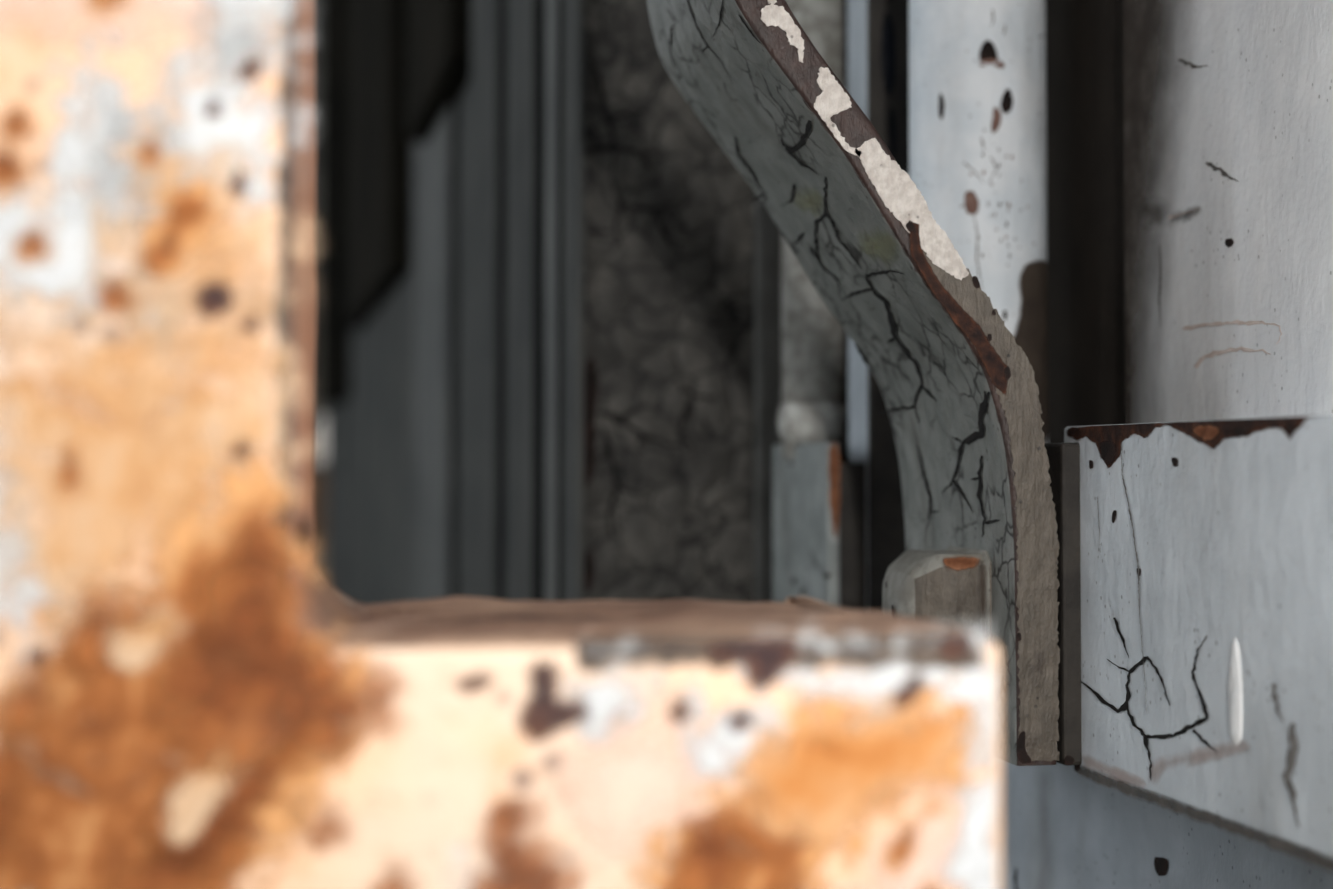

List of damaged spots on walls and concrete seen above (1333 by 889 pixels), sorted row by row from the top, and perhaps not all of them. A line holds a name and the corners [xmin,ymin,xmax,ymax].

crack [670,0,764,85]
peeling [760,0,805,63]
crack [601,375,721,462]
crack [734,120,999,544]
peeling [803,13,1081,771]
corrosion [909,221,1007,394]
corrosion [1068,416,1317,468]
corrosion [0,453,399,889]
corrosion [475,801,582,889]
corrosion [636,687,971,889]
peeling [671,631,997,889]
crack [1271,684,1300,827]